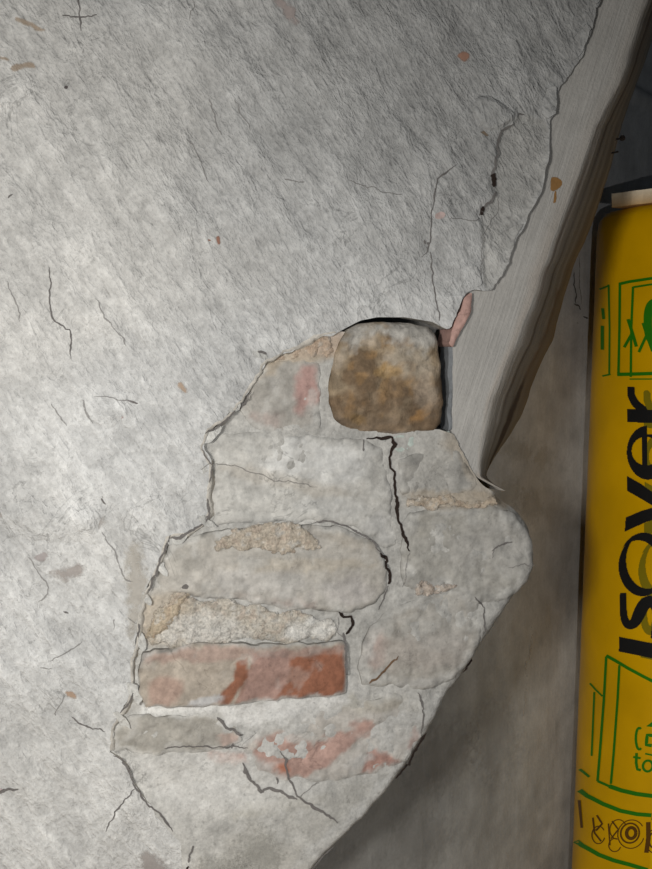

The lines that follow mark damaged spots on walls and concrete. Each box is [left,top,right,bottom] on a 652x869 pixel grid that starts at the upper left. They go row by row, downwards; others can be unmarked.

crack [62,0,97,29]
crack [48,268,72,357]
crack [362,436,410,551]
spalling [110,331,337,751]
crack [311,520,392,610]
crack [339,612,354,675]
crack [369,657,398,684]
crack [71,716,105,732]
crack [106,755,173,832]
crack [165,717,338,824]
crack [396,693,427,778]